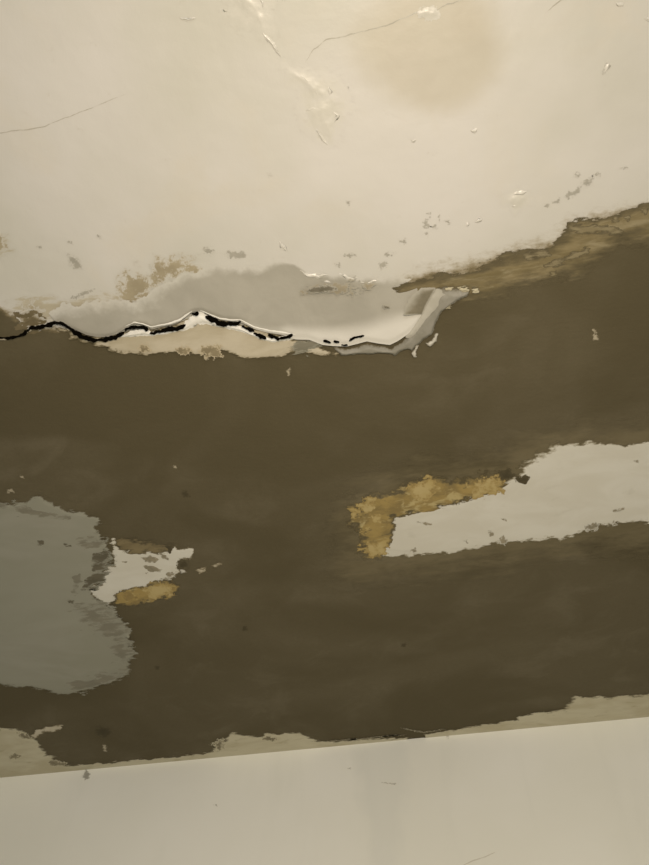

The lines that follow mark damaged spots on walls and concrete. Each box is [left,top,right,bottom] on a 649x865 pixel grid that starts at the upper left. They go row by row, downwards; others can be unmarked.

crack [306,0,461,61]
damp [332,0,519,124]
crack [0,311,293,343]
crack [323,335,364,346]
spalling [0,171,649,766]